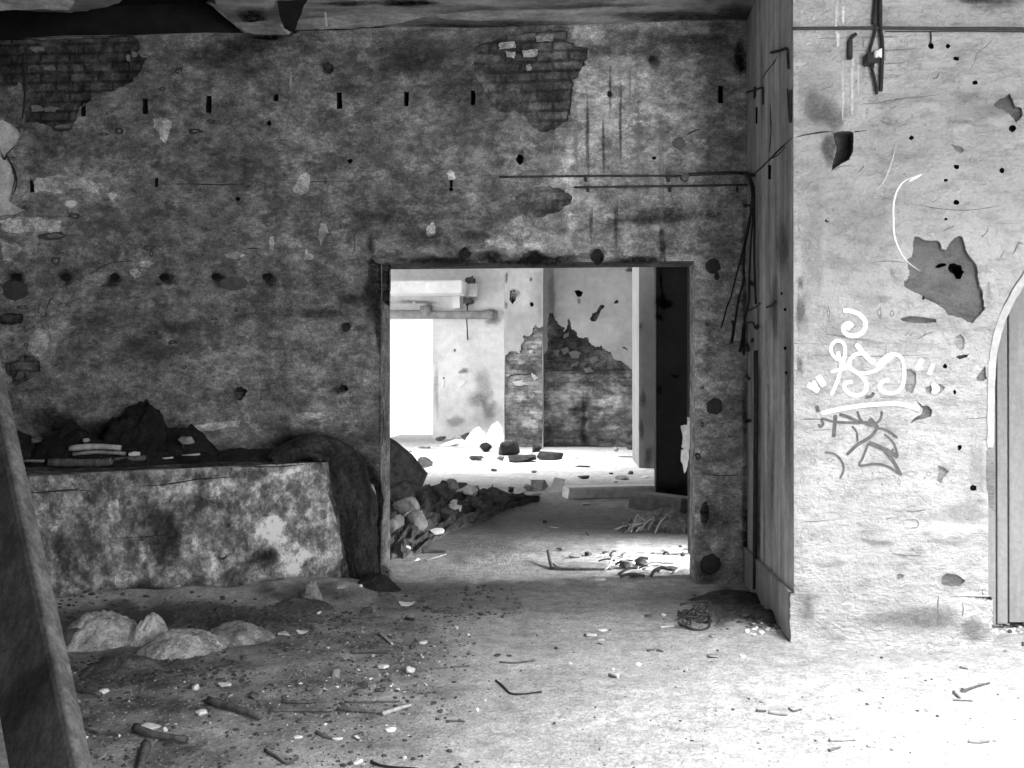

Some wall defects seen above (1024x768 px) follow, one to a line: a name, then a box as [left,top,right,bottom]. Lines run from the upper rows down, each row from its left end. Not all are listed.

spalling [0,35,149,261]
spalling [471,29,588,132]
spalling [994,94,1023,132]
spalling [876,236,986,346]
spalling [504,313,632,447]